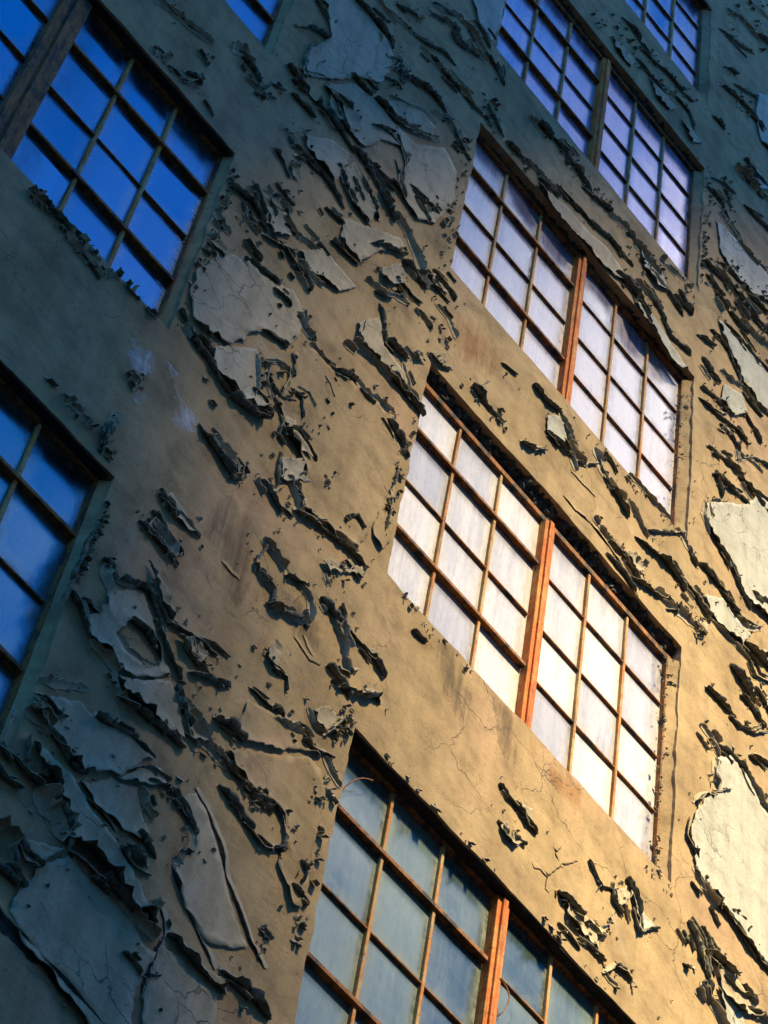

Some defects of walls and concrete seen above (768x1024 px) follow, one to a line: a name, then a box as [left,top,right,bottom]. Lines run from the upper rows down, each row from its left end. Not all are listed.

peeling [153,0,218,117]
peeling [177,0,768,820]
peeling [136,487,204,566]
peeling [0,500,391,1024]
crack [532,841,578,893]
peeling [542,859,661,989]
peeling [675,916,768,1024]
peeling [686,719,768,970]